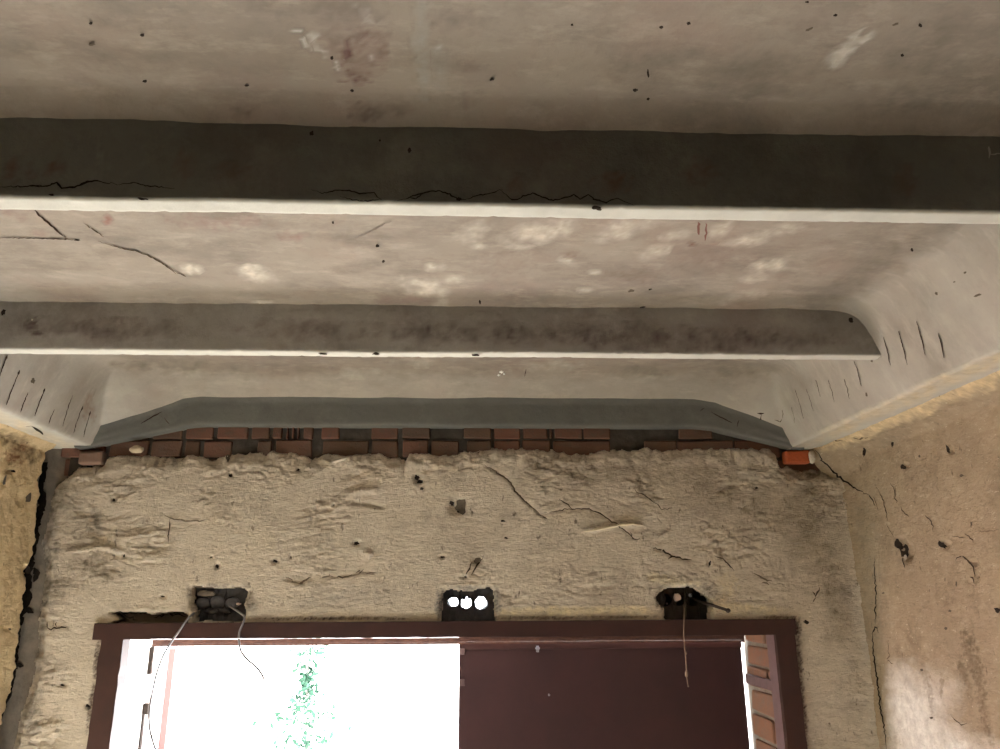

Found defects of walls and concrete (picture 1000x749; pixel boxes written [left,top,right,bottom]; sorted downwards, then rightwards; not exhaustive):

crack [6,180,175,189]
crack [311,189,634,206]
crack [84,223,186,277]
crack [484,464,733,569]
crack [872,558,892,749]